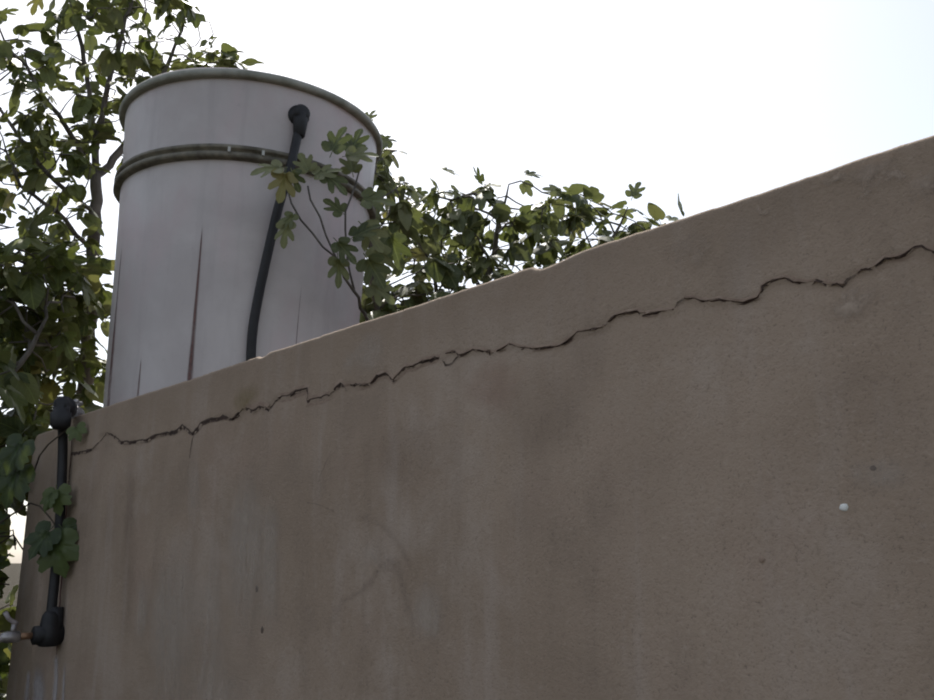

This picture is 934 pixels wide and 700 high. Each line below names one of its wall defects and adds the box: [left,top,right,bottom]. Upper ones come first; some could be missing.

crack [71,244,934,457]